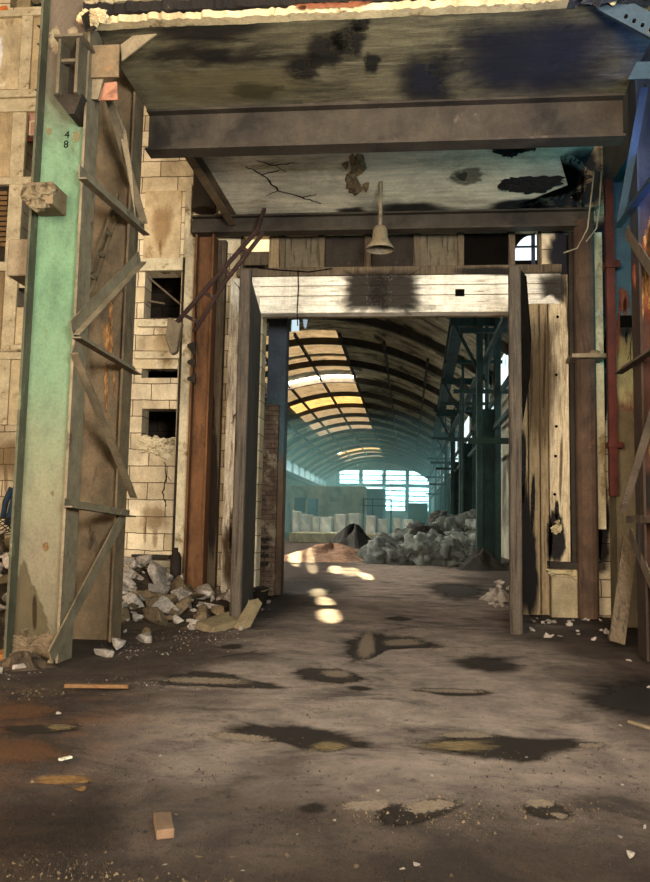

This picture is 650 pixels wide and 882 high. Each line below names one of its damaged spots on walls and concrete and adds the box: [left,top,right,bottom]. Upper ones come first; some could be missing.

peeling [49,27,77,53]
leakage [351,19,370,31]
leakage [364,55,381,72]
leakage [401,53,451,100]
crack [245,161,321,204]
spalling [342,153,369,196]
rust [635,223,650,318]